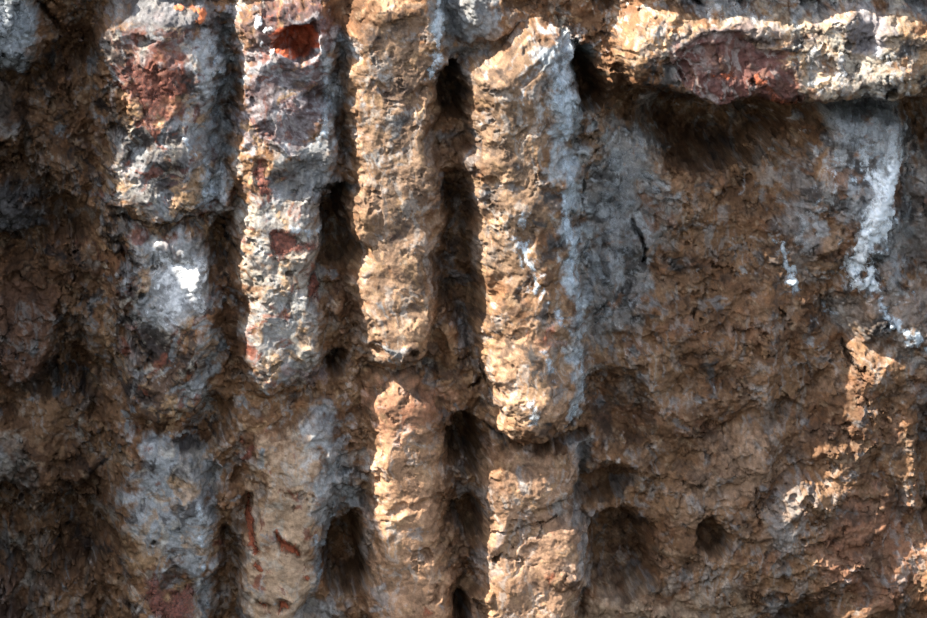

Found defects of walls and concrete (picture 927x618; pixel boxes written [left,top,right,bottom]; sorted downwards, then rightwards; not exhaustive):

spalling [265,19,323,67]